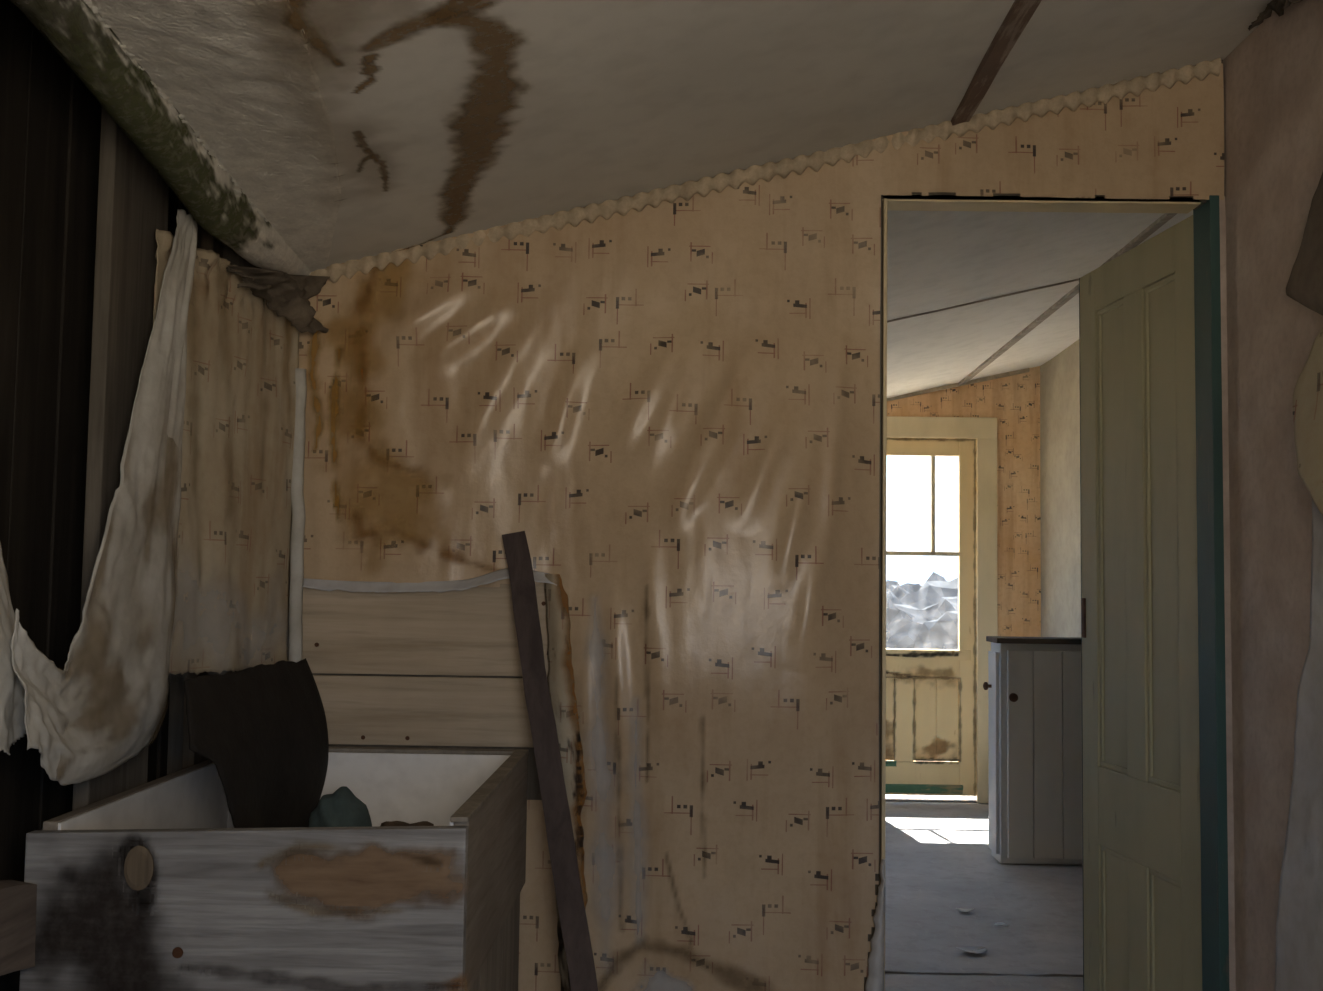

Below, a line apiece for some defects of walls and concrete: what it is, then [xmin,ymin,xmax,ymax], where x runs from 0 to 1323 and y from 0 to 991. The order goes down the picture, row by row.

leakage [9,0,273,255]
leakage [285,0,343,66]
leakage [353,0,525,251]